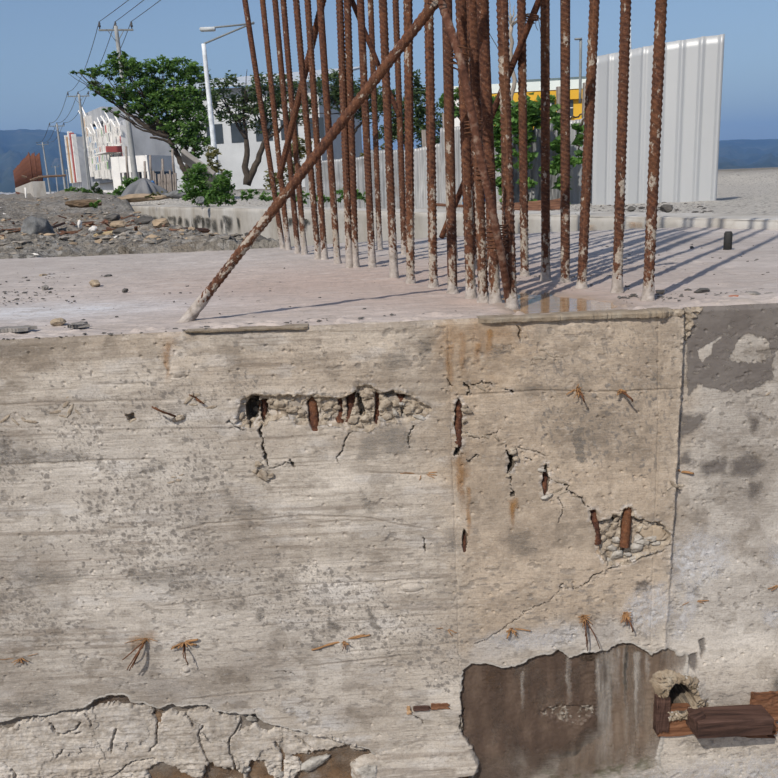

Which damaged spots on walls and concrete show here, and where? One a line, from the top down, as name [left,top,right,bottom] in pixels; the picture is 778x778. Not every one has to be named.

spalling [673,306,704,341]
spalling [234,384,434,433]
crack [259,426,294,468]
spalling [589,506,672,567]
peeling [459,640,689,695]
peeling [0,693,376,778]
leakage [460,643,678,778]
leakage [151,750,368,778]